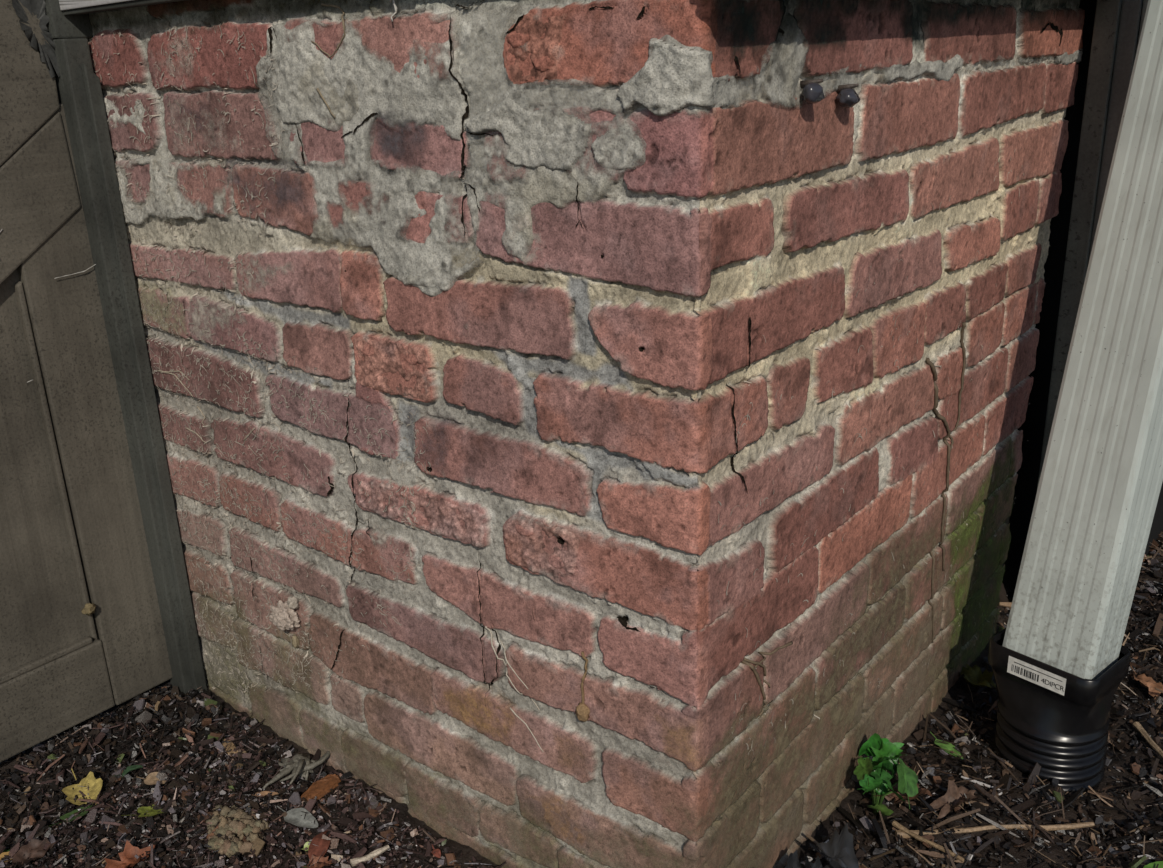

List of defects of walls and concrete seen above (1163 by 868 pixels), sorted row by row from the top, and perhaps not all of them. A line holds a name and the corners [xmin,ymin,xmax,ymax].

peeling [274,42,359,132]
crack [448,0,496,245]
peeling [465,13,645,171]
peeling [616,38,715,116]
leakage [716,0,1081,50]
crack [726,317,751,493]
crack [327,393,372,589]
crack [477,553,501,719]